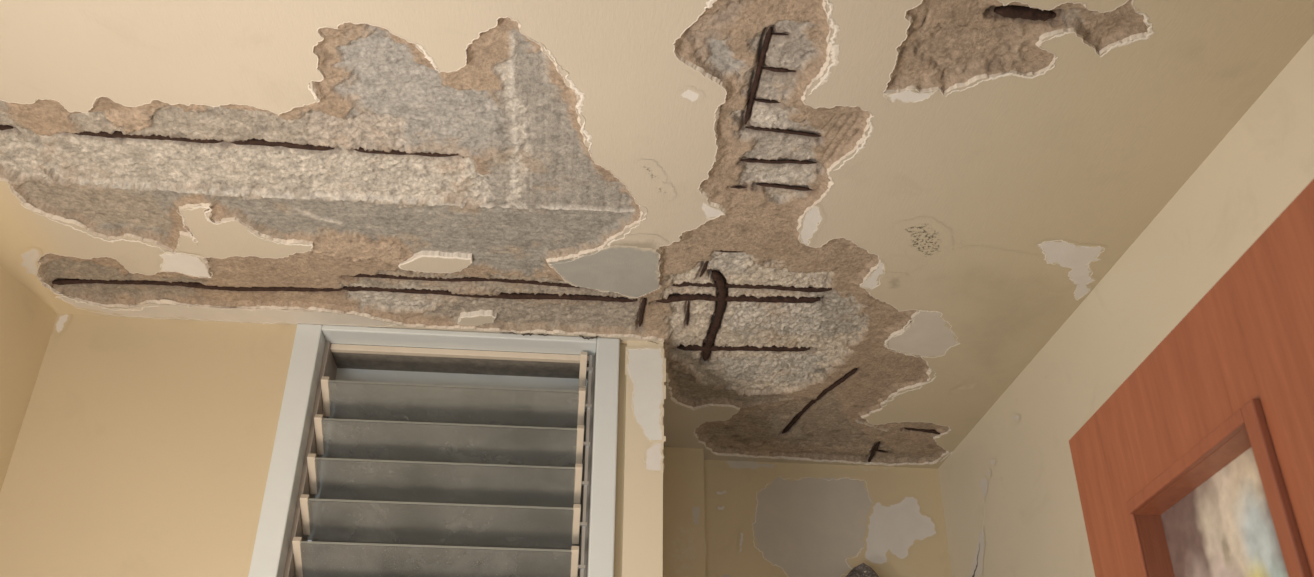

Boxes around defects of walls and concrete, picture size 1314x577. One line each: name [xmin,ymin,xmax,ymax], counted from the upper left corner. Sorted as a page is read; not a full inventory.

spalling [879,0,1155,106]
spalling [0,0,963,577]
peeling [1034,239,1109,302]